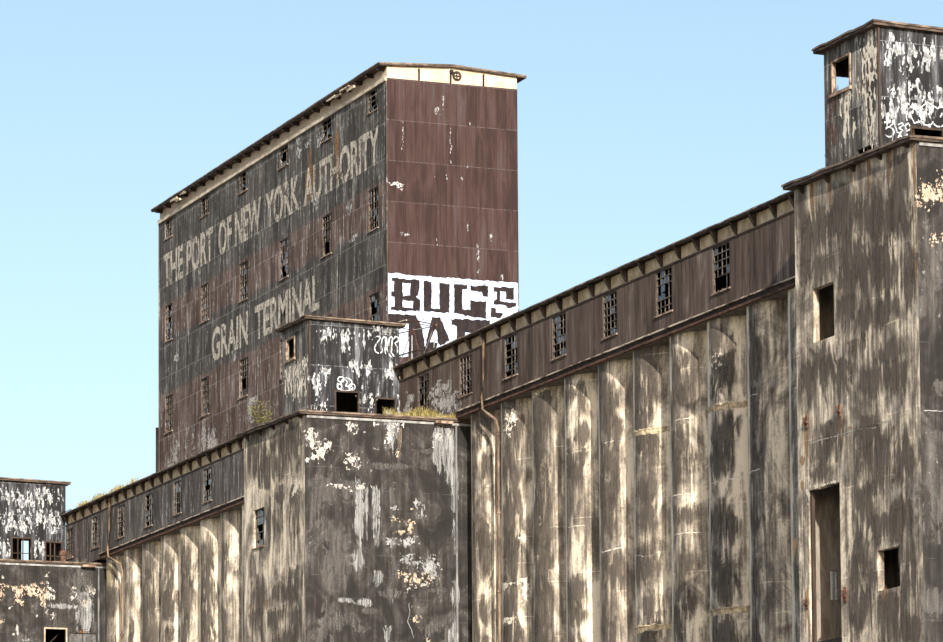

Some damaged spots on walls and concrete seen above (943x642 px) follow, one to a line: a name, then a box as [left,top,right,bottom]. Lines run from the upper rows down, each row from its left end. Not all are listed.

peeling [839,29,943,156]
peeling [915,169,943,212]
peeling [0,572,56,620]
peeling [304,427,361,471]
peeling [383,498,442,590]
leakage [472,390,555,642]
leakage [565,380,590,486]
leakage [599,373,624,540]
leakage [634,347,699,642]
leakage [708,323,761,481]
leakage [711,497,765,642]
leakage [795,153,943,642]